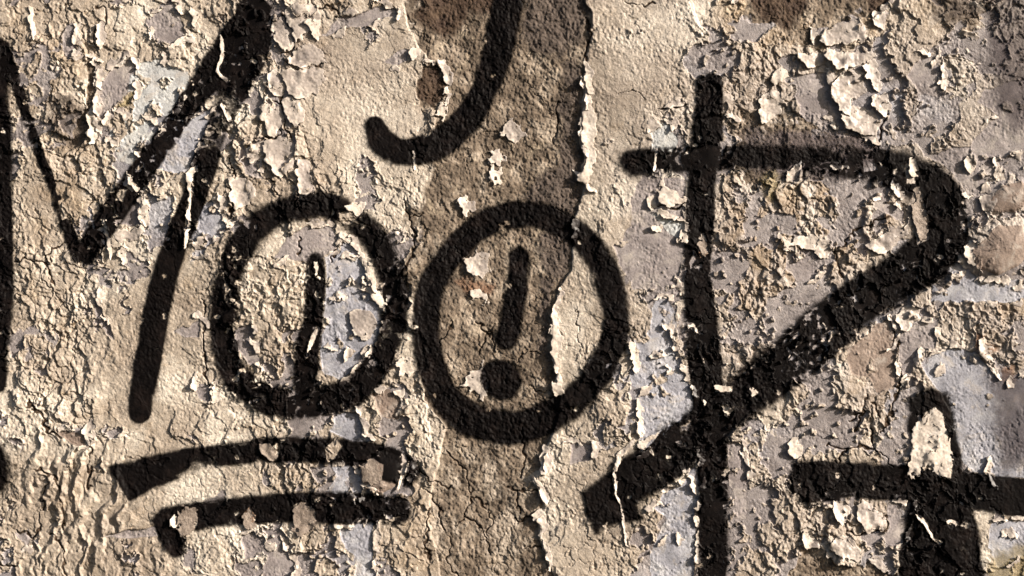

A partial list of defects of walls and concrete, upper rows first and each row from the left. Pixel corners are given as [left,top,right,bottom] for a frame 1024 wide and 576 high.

peeling [62,0,491,265]
flaking render [395,0,597,413]
peeling [724,0,894,146]
peeling [865,85,1024,254]
peeling [273,218,390,385]
peeling [326,457,383,576]
crack [420,443,542,576]
flaking render [372,356,602,576]
peeling [612,98,708,547]
peeling [644,446,707,576]
flaking render [788,494,943,576]
peeling [847,305,1024,490]